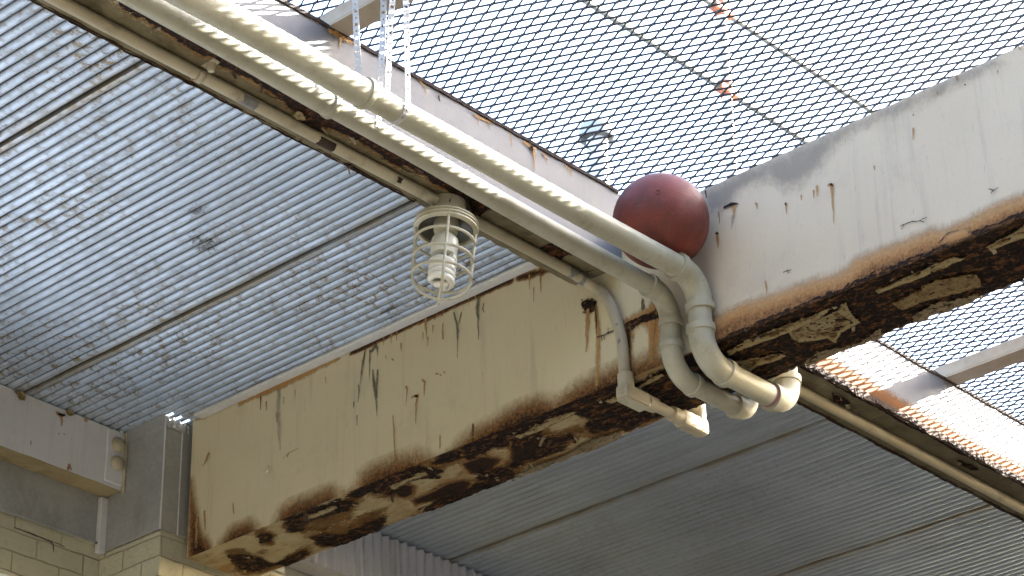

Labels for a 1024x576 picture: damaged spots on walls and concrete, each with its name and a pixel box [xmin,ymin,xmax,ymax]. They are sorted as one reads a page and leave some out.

rust [712,194,1024,342]
water stain [353,344,378,419]
peeling [225,301,707,576]
rust [454,298,663,449]
peeling [684,353,736,393]
peeling [717,219,1024,487]